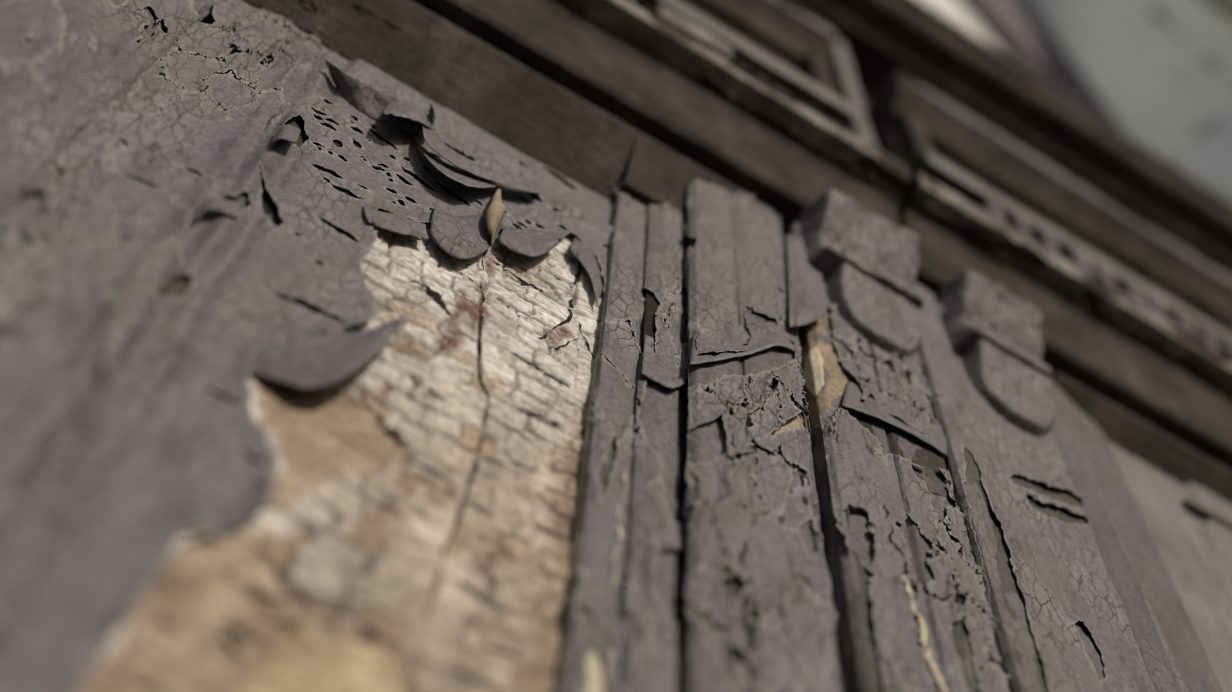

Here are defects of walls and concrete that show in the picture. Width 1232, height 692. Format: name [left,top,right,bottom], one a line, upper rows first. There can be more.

crack [259,165,283,228]
crack [320,218,359,243]
crack [313,103,482,206]
crack [513,162,591,230]
peeling [79,59,604,692]
crack [240,237,609,651]
peeling [599,436,617,498]
peeling [637,232,949,624]
peeling [587,640,614,692]
peeling [835,538,889,692]
peeling [951,613,981,692]
peeling [963,447,1048,692]